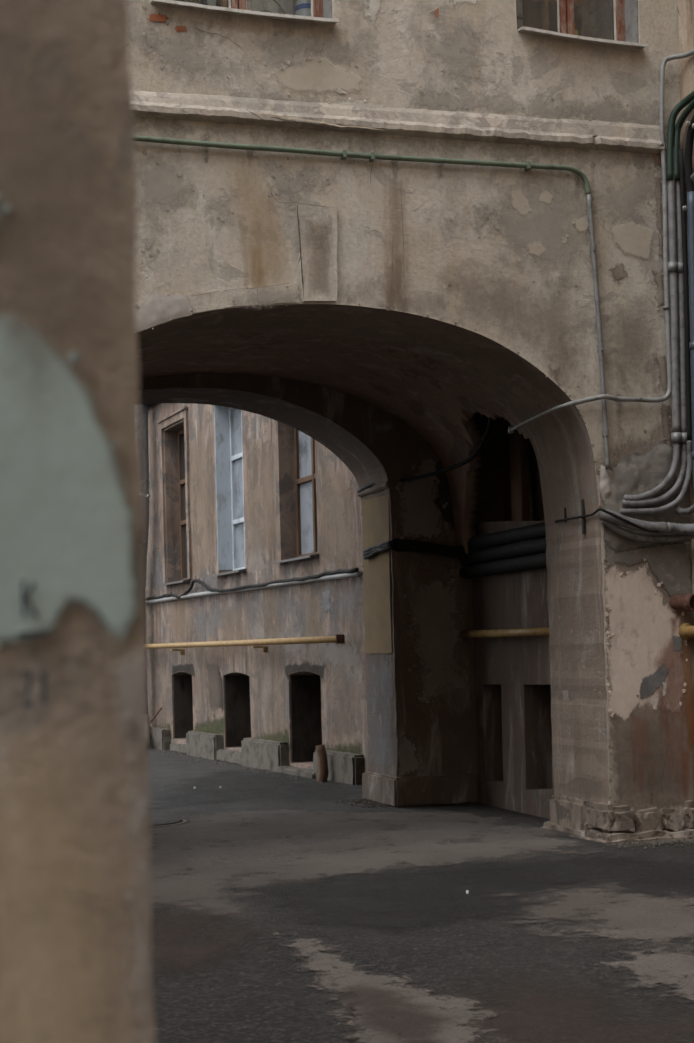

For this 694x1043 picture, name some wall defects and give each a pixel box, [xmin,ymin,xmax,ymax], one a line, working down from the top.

peeling [261,57,361,104]
peeling [609,154,665,311]
flaking render [596,357,690,519]